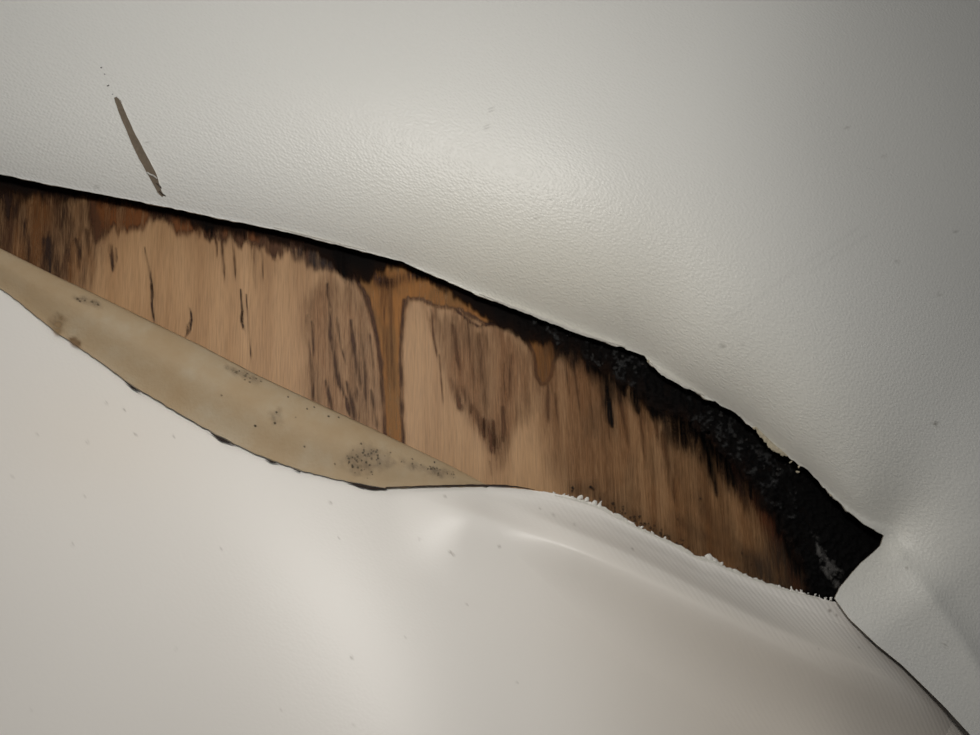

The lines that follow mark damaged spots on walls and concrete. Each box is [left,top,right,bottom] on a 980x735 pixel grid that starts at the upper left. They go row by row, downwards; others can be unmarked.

peeling [0,248,535,490]
damp [0,175,883,603]
peeling [553,492,666,539]